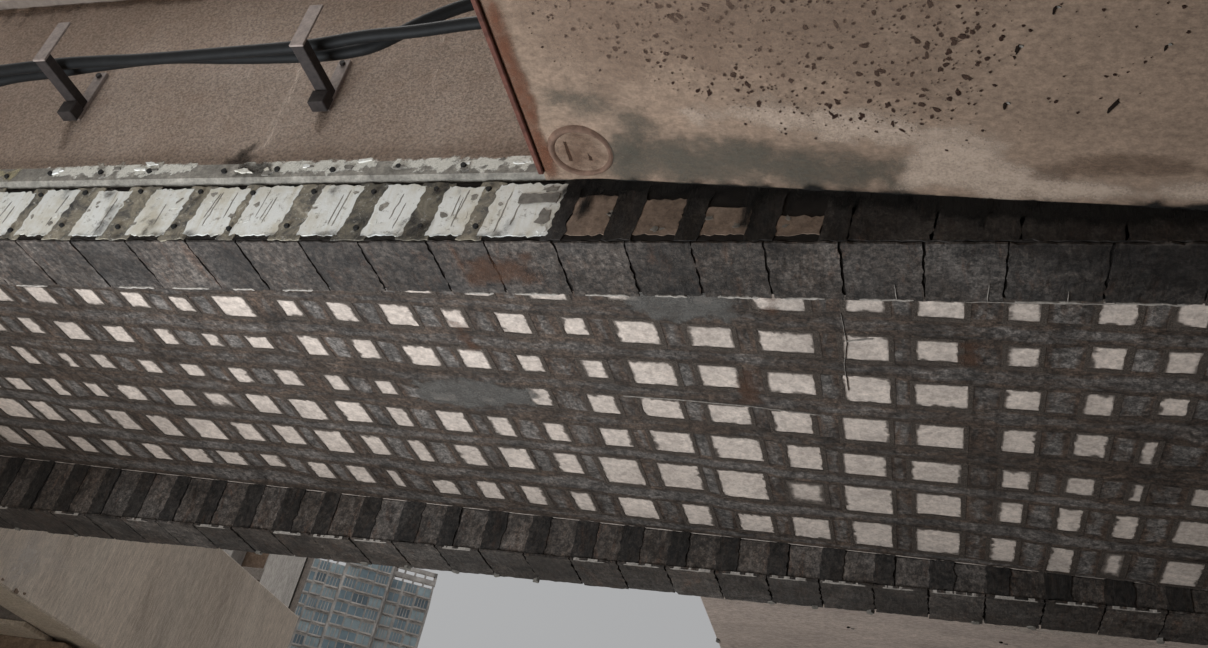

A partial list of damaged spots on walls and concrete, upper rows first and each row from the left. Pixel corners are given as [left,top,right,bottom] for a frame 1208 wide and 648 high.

leakage [531,0,1208,227]
peeling [0,158,377,237]
peeling [360,155,618,238]